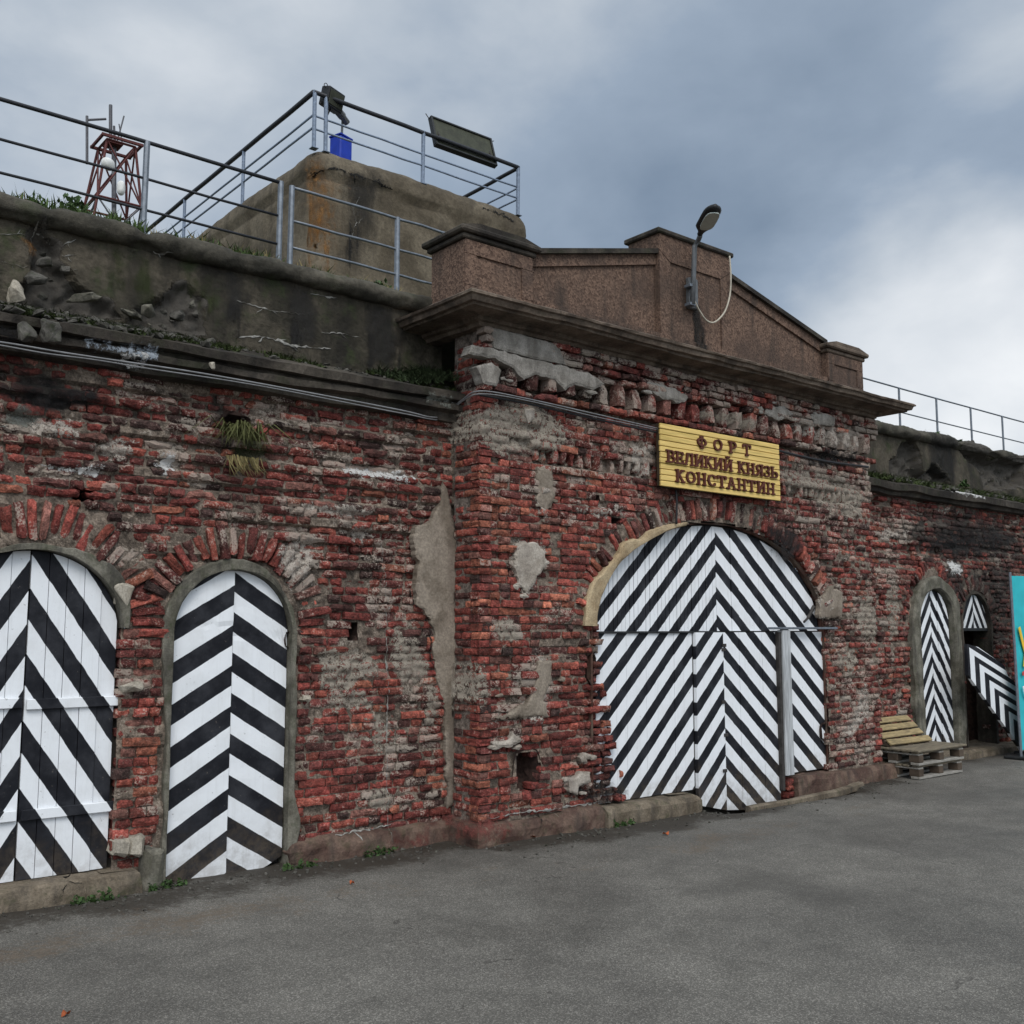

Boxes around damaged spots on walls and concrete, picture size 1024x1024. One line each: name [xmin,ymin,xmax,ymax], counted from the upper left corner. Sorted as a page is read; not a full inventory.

spalling [20,216,120,319]
flaking render [461,328,604,395]
flaking render [641,382,688,404]
hole [344,619,358,641]